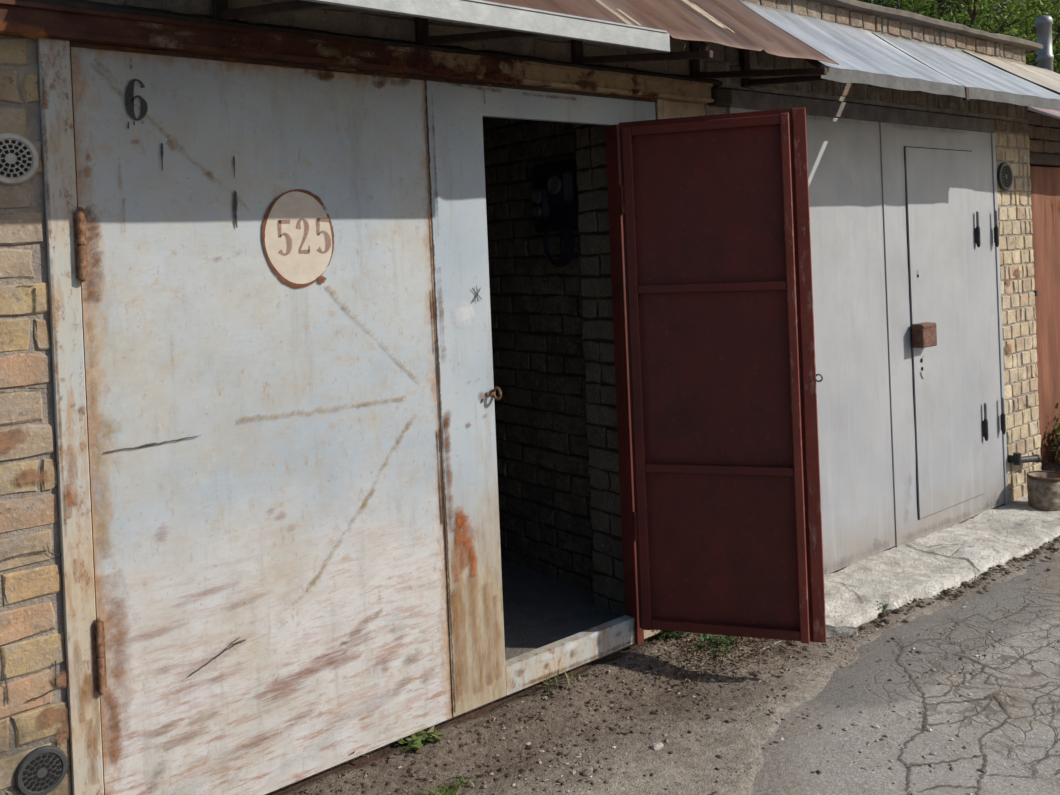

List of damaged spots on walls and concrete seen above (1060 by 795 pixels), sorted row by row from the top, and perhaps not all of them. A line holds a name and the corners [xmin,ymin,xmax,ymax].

rust [424,80,477,713]
crack [905,603,1060,791]